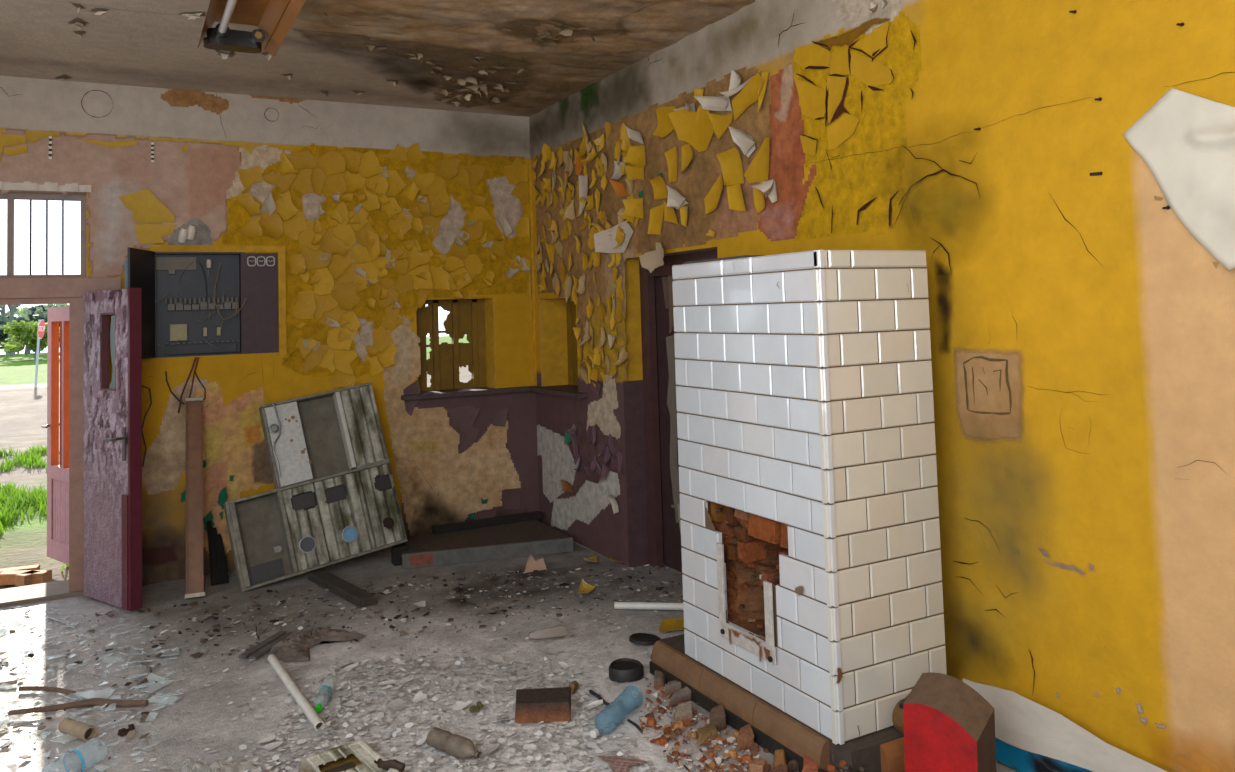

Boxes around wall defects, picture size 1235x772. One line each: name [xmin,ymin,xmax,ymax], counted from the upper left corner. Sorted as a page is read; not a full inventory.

peeling [495,20,625,47]
peeling [833,0,904,35]
crack [777,11,1094,241]
peeling [0,62,816,555]